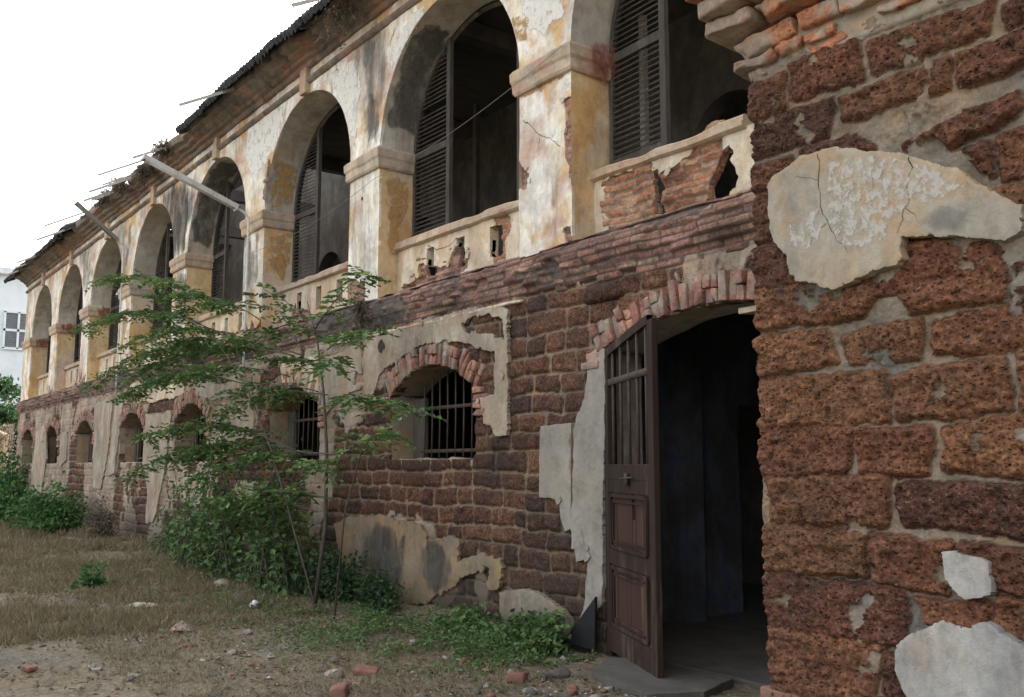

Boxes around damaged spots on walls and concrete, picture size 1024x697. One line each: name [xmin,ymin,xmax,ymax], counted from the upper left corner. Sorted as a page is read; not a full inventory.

peeling [512,0,564,41]
damp [364,27,449,141]
peeling [386,178,408,254]
flaking render [404,244,471,289]
flaking render [491,215,512,263]
flaking render [599,120,733,229]
crack [794,154,847,250]
peeling [790,155,964,248]
damp [362,526,404,587]
damp [426,541,449,593]